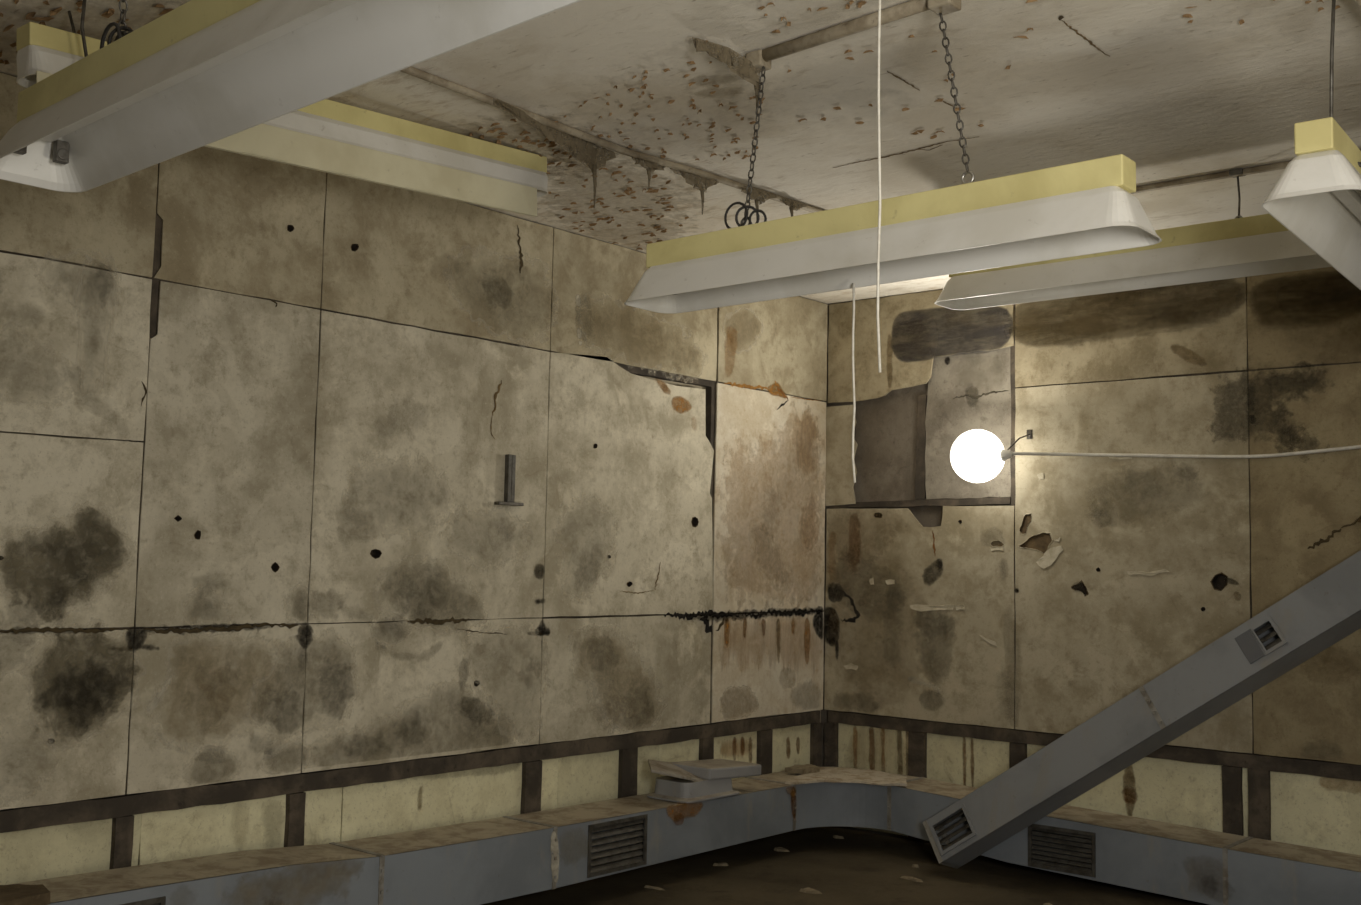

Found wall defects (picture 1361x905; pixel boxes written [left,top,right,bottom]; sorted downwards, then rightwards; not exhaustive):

crack [491,380,502,439]
damp [1214,364,1325,450]
spalling [1017,513,1063,569]
damp [2,507,158,737]
corrosion [725,619,810,661]